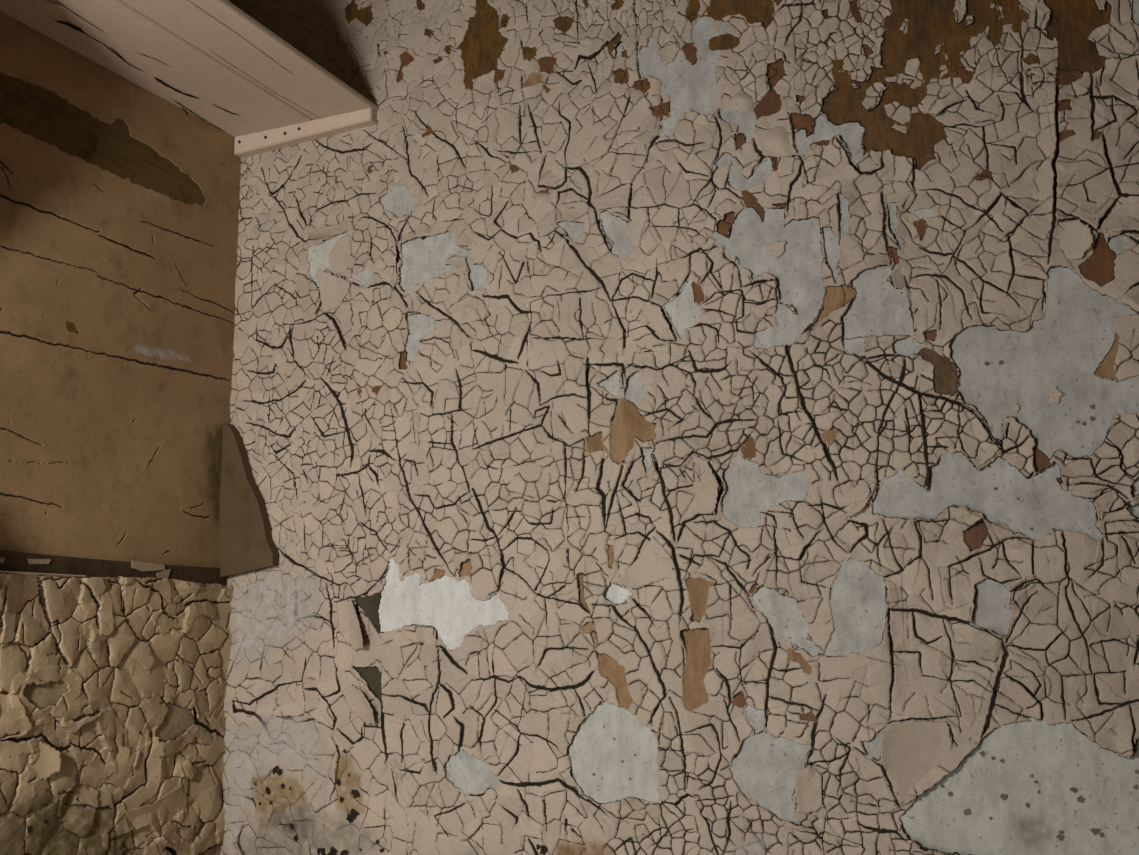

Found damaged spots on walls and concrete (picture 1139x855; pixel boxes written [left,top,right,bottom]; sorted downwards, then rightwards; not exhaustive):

peeling [433,0,510,91]
crack [553,0,614,92]
crack [840,0,1139,332]
crack [0,161,234,324]
flaking render [597,0,1139,550]
crack [233,79,1139,855]
flaking render [336,557,510,651]
flaking render [567,574,662,804]
leakage [233,725,317,835]
leakage [317,847,362,855]
leakage [335,749,361,823]
flaking render [863,716,1139,855]